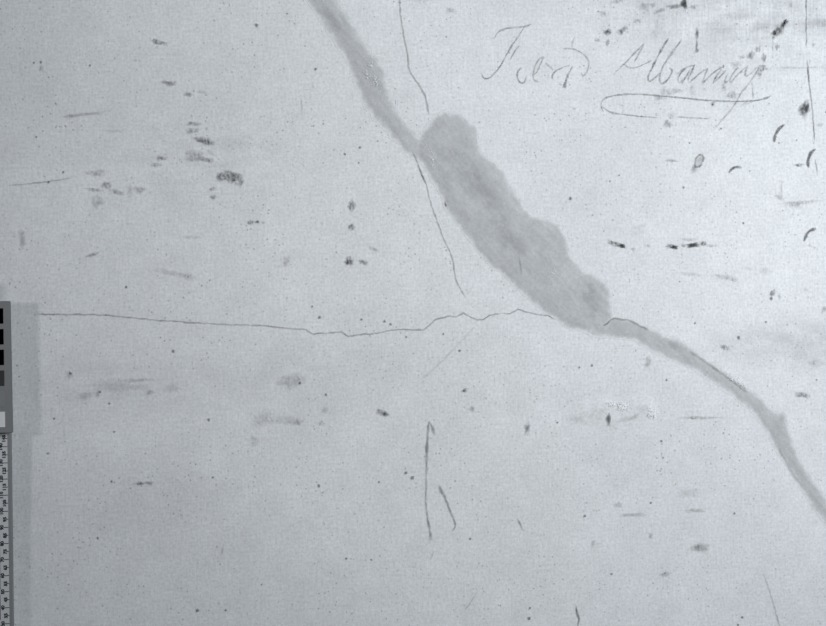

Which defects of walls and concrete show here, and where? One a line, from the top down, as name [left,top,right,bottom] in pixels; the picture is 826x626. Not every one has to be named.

crack [306,0,826,525]